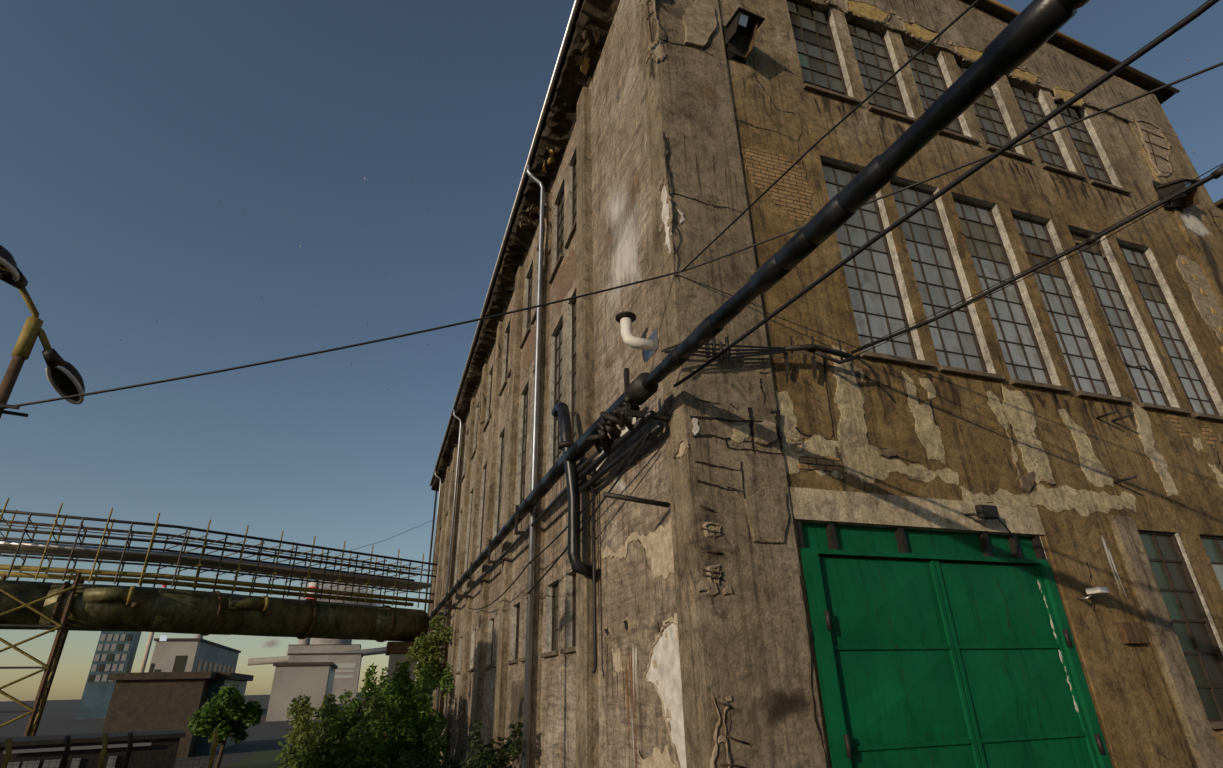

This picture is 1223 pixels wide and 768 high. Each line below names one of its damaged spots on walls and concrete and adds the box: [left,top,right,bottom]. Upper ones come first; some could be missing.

peeling [731,424,750,444]
peeling [774,345,1136,516]
peeling [638,613,687,768]
spalling [709,693,749,768]